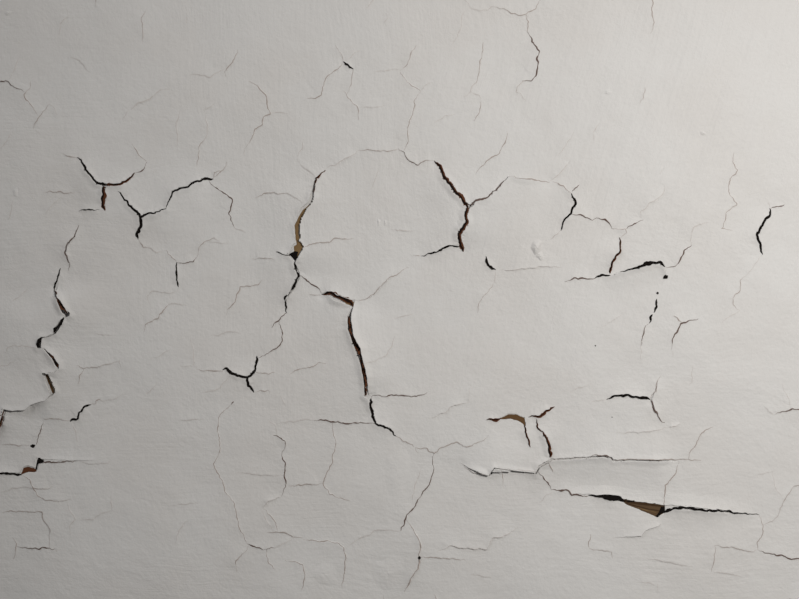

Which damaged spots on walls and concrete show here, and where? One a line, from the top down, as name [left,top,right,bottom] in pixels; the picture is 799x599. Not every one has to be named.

peeling [0,222,128,473]
crack [1,141,244,395]
peeling [58,149,220,255]
crack [179,47,799,590]
peeling [451,373,734,538]